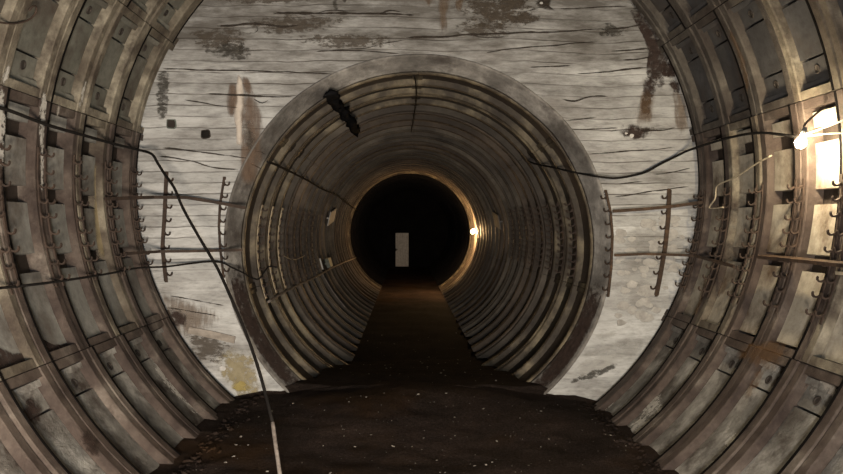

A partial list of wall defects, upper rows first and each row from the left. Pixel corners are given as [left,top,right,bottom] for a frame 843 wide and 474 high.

crack [220,10,413,32]
leakage [253,0,389,48]
leakage [454,0,540,37]
leakage [190,28,251,60]
crack [317,24,649,74]
crack [165,67,330,75]
crack [186,93,292,108]
leakage [234,77,254,147]
crack [563,95,614,130]
crack [160,147,264,170]
leakage [535,288,601,386]
leakage [573,365,615,383]